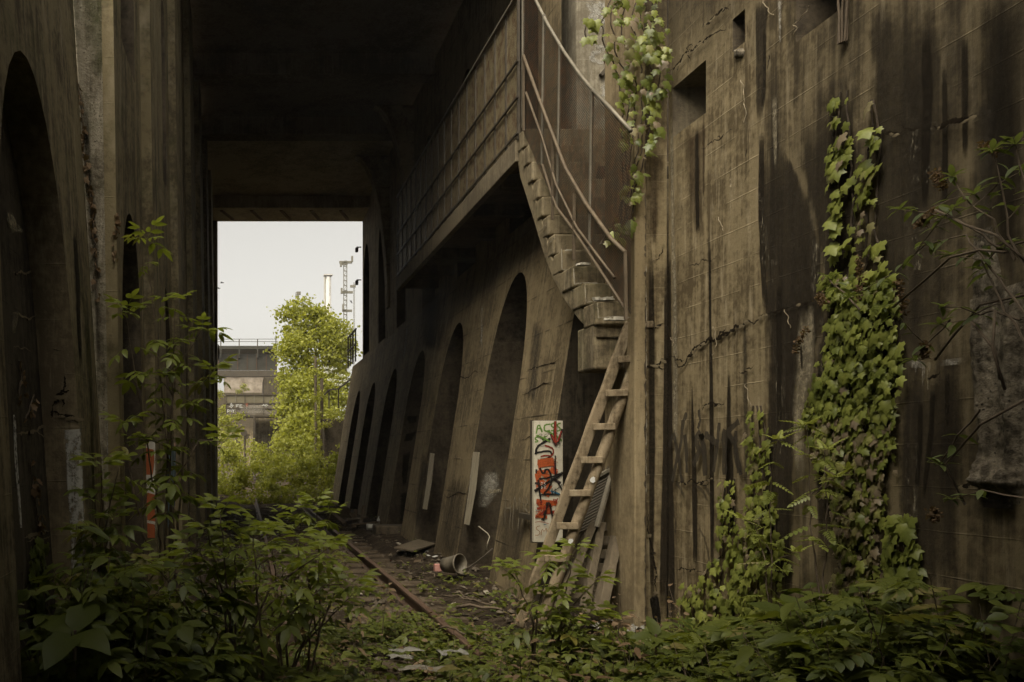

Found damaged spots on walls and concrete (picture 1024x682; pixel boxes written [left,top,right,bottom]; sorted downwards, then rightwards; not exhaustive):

crack [669,4,731,73]
leakage [872,20,948,341]
crack [647,299,817,370]
leakage [758,109,856,577]
leakage [900,360,961,571]